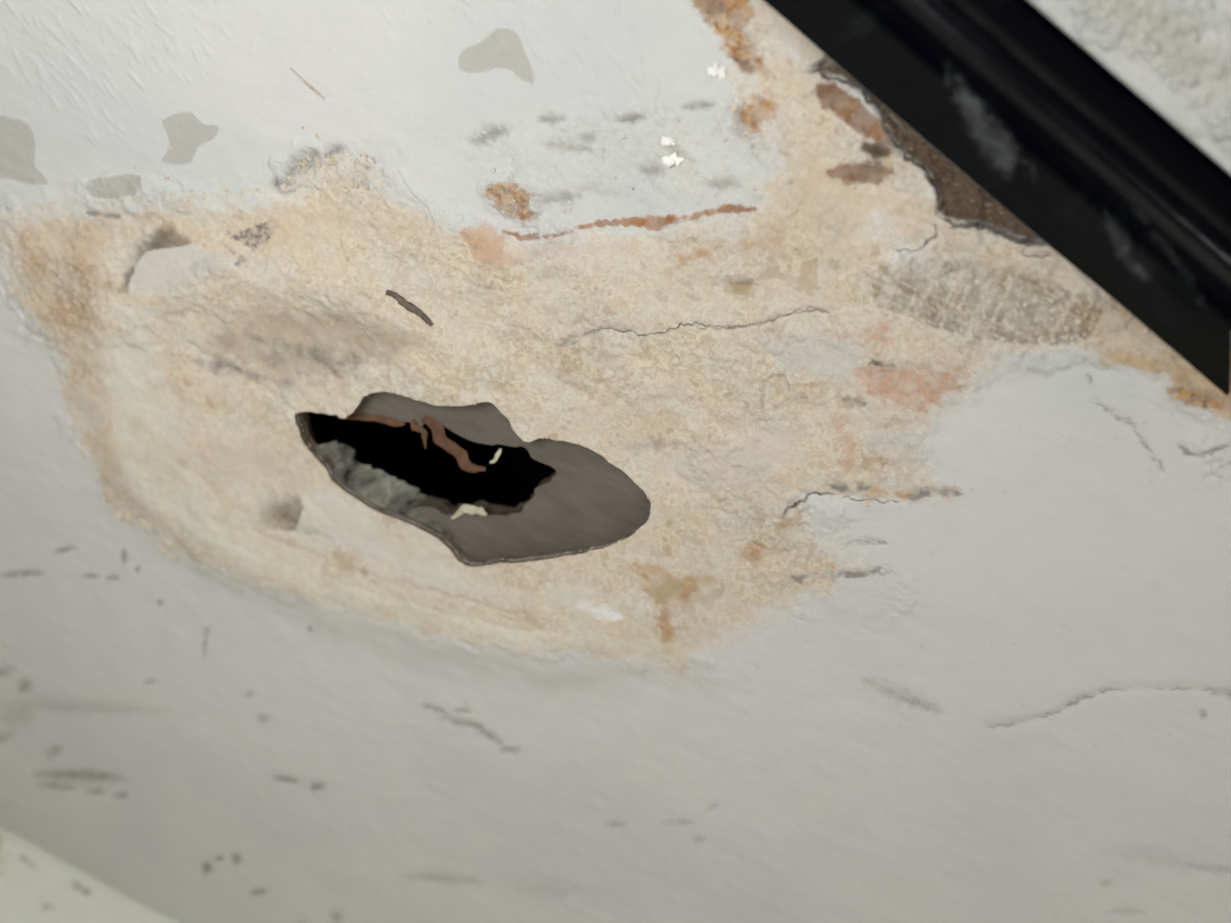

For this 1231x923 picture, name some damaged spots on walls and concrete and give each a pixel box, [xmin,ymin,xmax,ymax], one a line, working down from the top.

rust [692,0,778,133]
peeling [86,175,141,198]
flaking render [280,150,375,204]
spalling [479,128,506,143]
rust [485,183,757,241]
flaking render [644,137,685,174]
rust [812,81,893,185]
flaking render [806,59,1046,338]
leakage [13,0,1231,673]
crack [582,306,837,336]